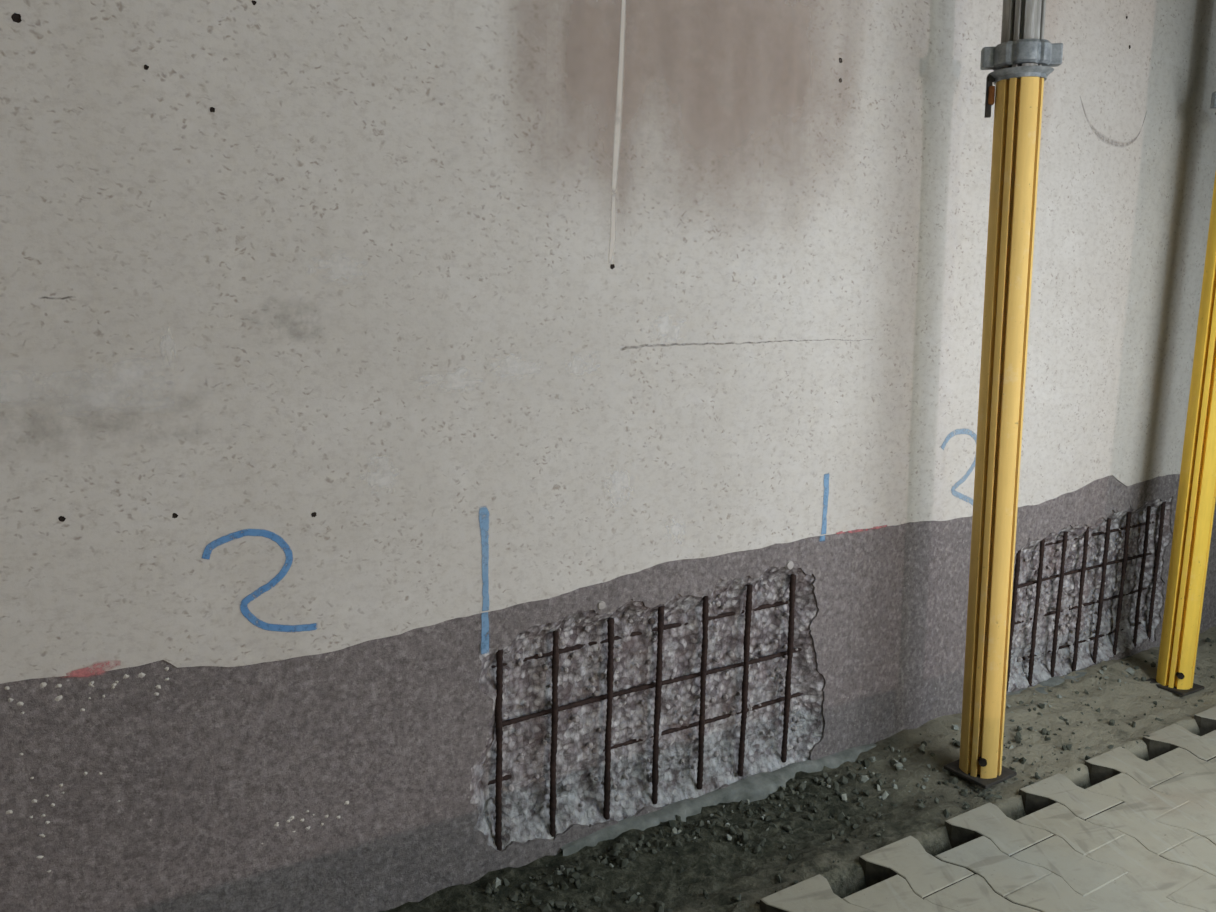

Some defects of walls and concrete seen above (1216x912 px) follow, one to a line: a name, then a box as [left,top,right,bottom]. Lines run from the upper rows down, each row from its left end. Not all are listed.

water stain [566,0,809,261]
peeling [0,516,972,912]
spalling [1006,474,1180,694]
peeling [1199,501,1216,634]